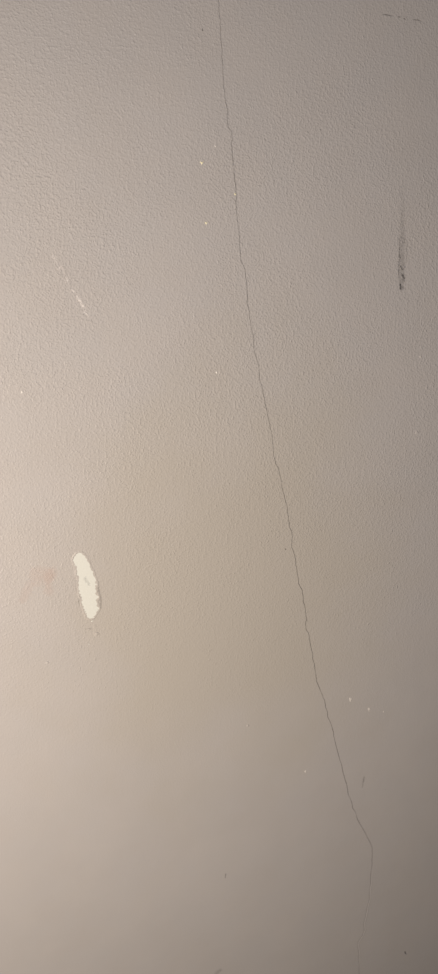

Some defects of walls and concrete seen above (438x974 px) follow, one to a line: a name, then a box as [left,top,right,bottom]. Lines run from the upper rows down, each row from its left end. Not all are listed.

spalling [71,551,101,645]